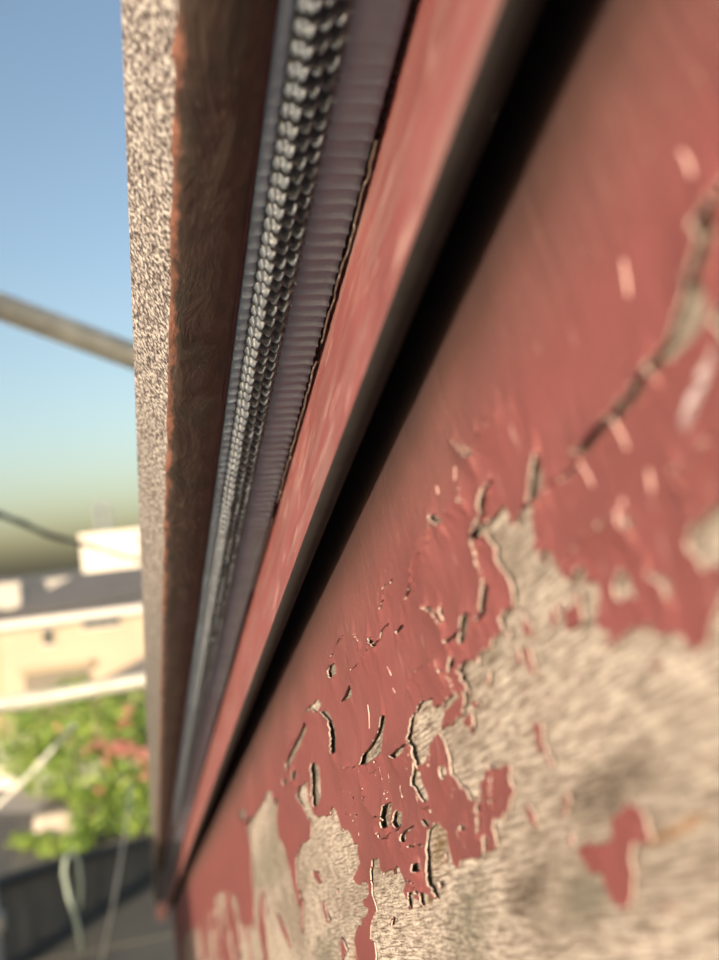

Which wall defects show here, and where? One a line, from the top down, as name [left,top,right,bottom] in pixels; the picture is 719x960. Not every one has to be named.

peeling [179,505,719,960]